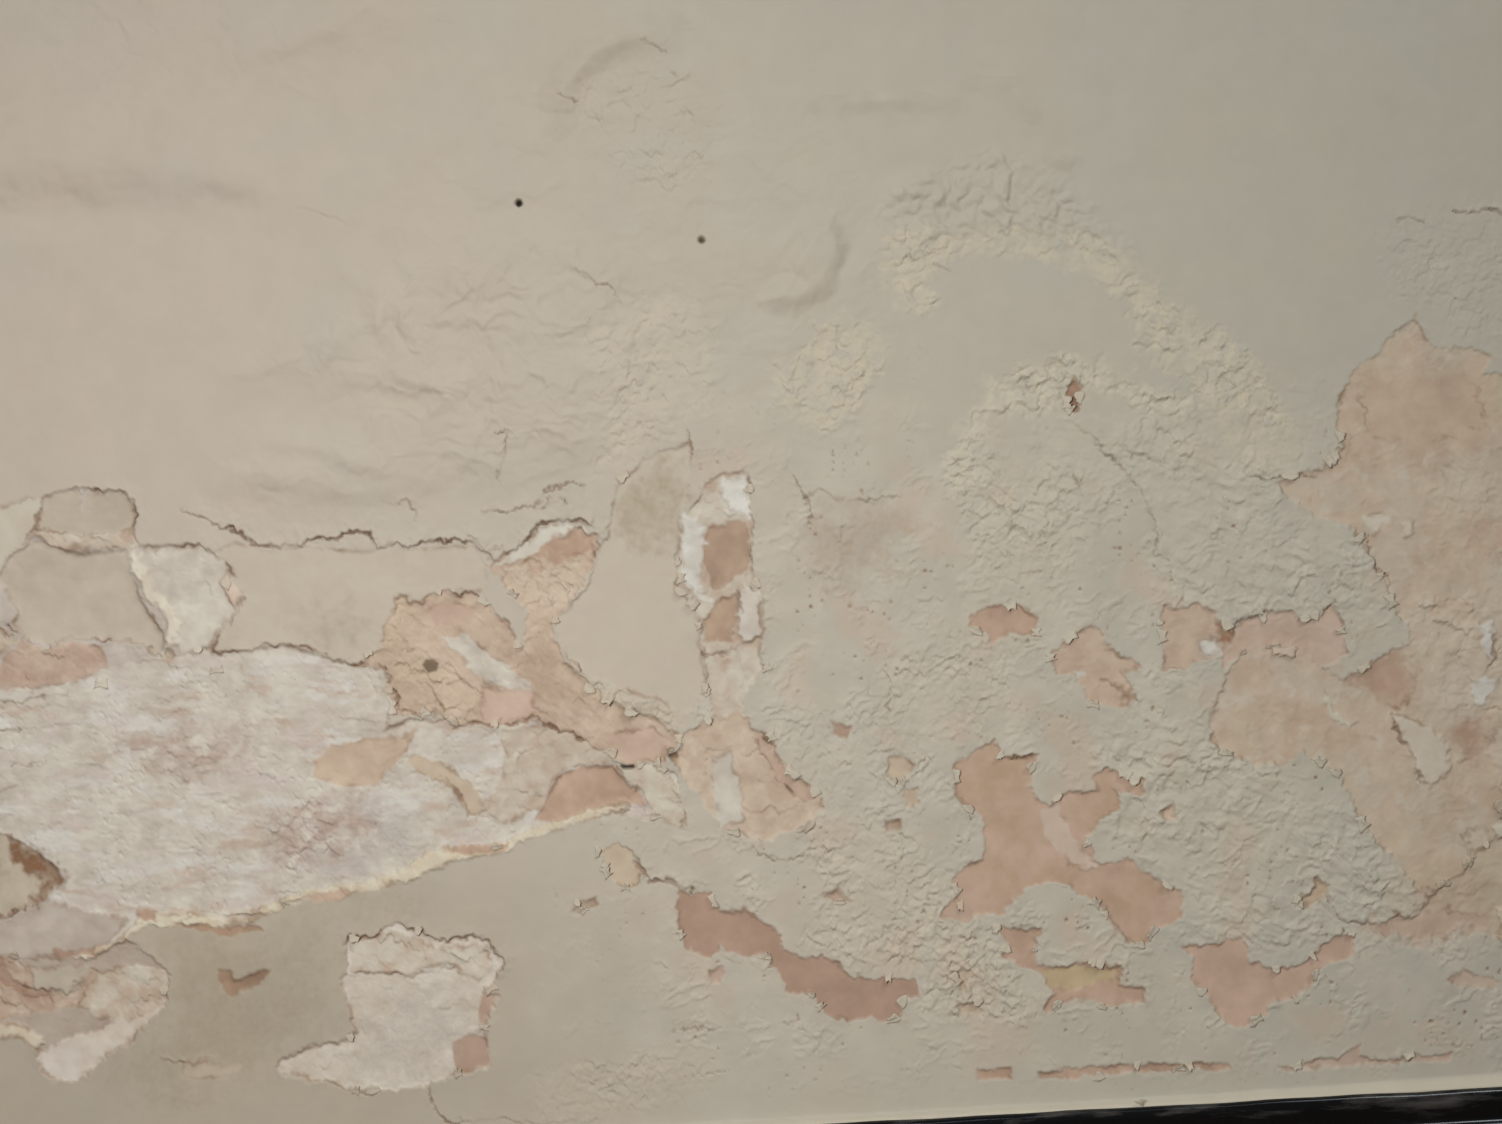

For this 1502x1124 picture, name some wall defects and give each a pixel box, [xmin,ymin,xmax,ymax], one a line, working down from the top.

peeling [969,317,1502,1029]
peeling [832,723,853,738]
flaking render [0,472,826,1099]
peeling [595,738,1185,1031]
peeling [977,1068,1013,1082]
peeling [1039,1061,1232,1082]
peeling [1280,1045,1454,1072]